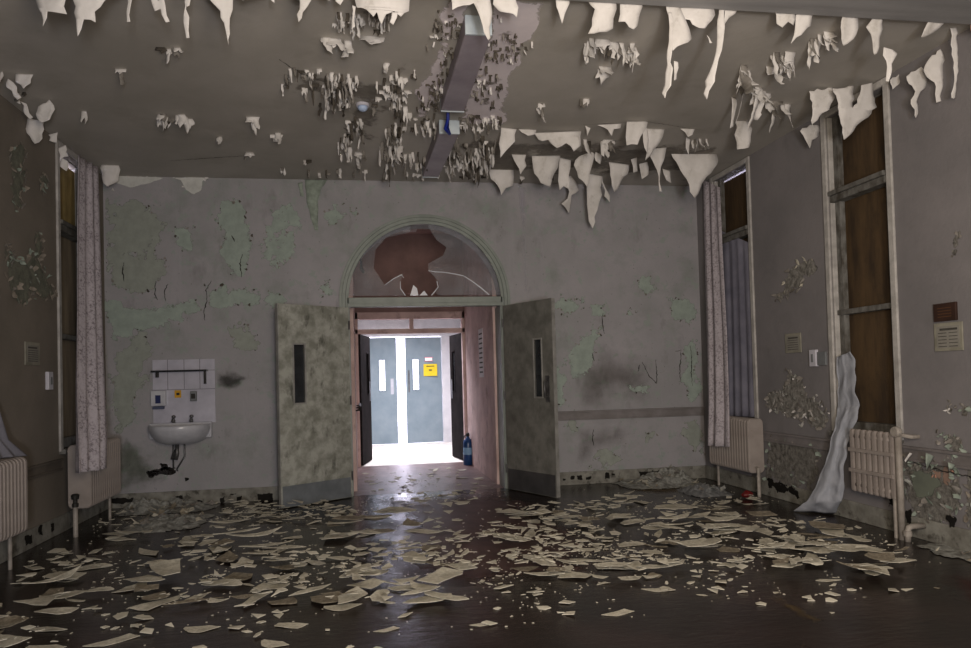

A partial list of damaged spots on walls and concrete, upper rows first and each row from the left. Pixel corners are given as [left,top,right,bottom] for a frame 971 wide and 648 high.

peeling [36,0,105,36]
peeling [151,0,170,22]
peeling [183,0,191,38]
peeling [210,0,233,45]
peeling [245,117,260,136]
peeling [281,0,718,230]
peeling [662,6,736,99]
peeling [730,65,877,149]
peeling [766,13,959,118]
peeling [100,165,208,294]
water stain [220,377,241,387]
peeling [903,429,971,528]